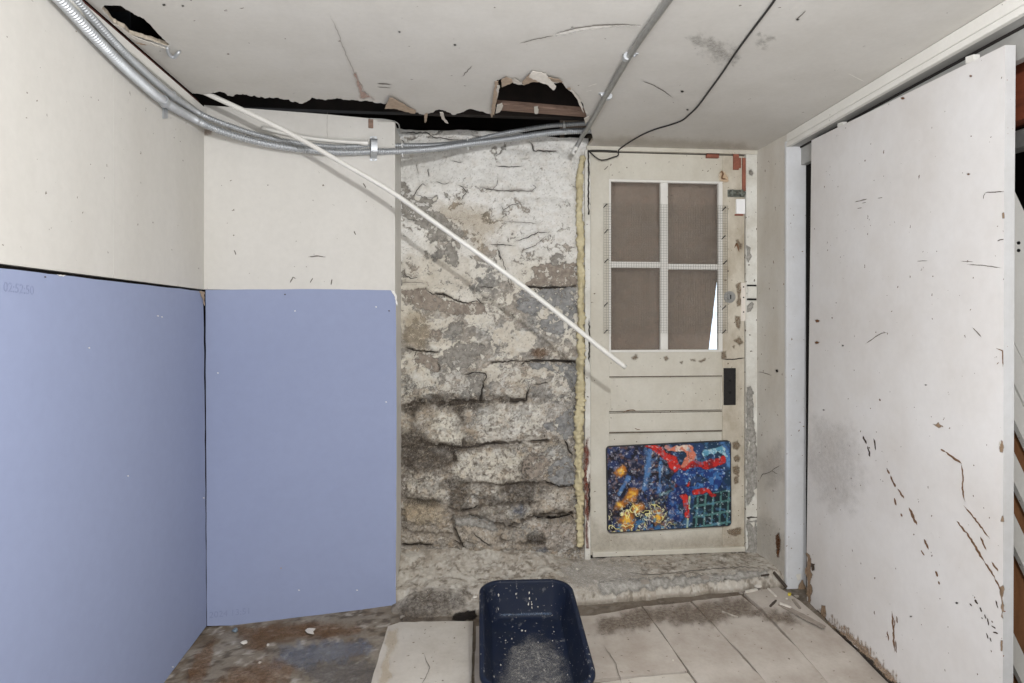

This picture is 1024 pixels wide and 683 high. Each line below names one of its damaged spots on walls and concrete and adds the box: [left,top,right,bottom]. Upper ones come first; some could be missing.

crack [330,16,367,96]
peeling [490,74,571,117]
spalling [733,386,757,504]
peeling [794,553,897,683]